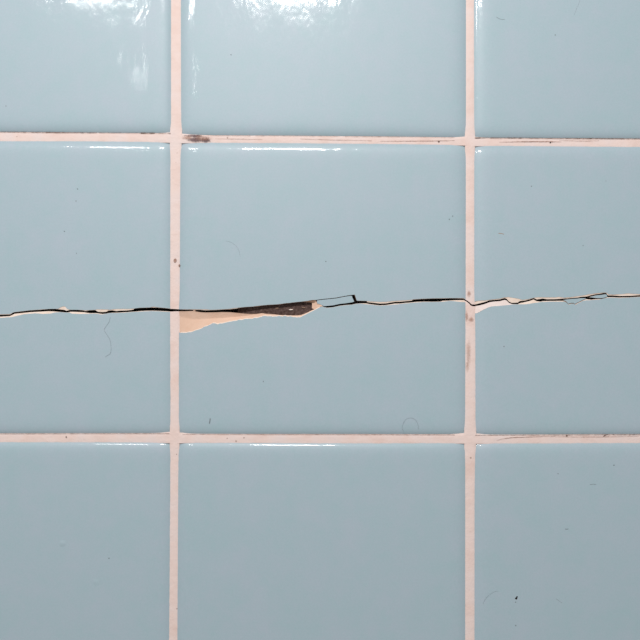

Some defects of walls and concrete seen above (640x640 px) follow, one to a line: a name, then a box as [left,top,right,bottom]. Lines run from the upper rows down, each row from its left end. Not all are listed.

spalling [179,307,319,333]
crack [0,292,640,356]